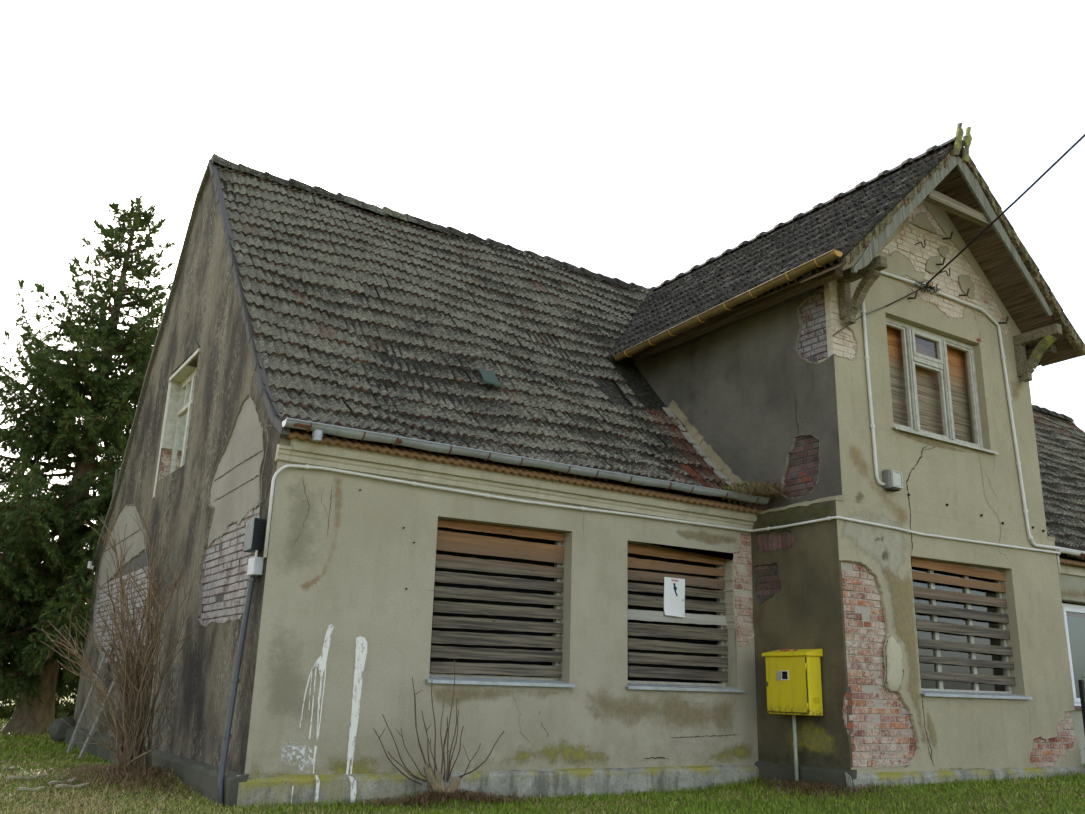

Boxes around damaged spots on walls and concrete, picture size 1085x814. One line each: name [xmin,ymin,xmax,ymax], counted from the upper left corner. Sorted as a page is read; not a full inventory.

flaking render [795,279,859,365]
flaking render [878,203,1014,339]
flaking render [197,394,292,627]
flaking render [780,434,821,499]
crack [906,445,937,554]
flaking render [94,504,155,664]
flaking render [732,529,796,647]
flaking render [841,560,920,769]
flaking render [1029,710,1079,768]